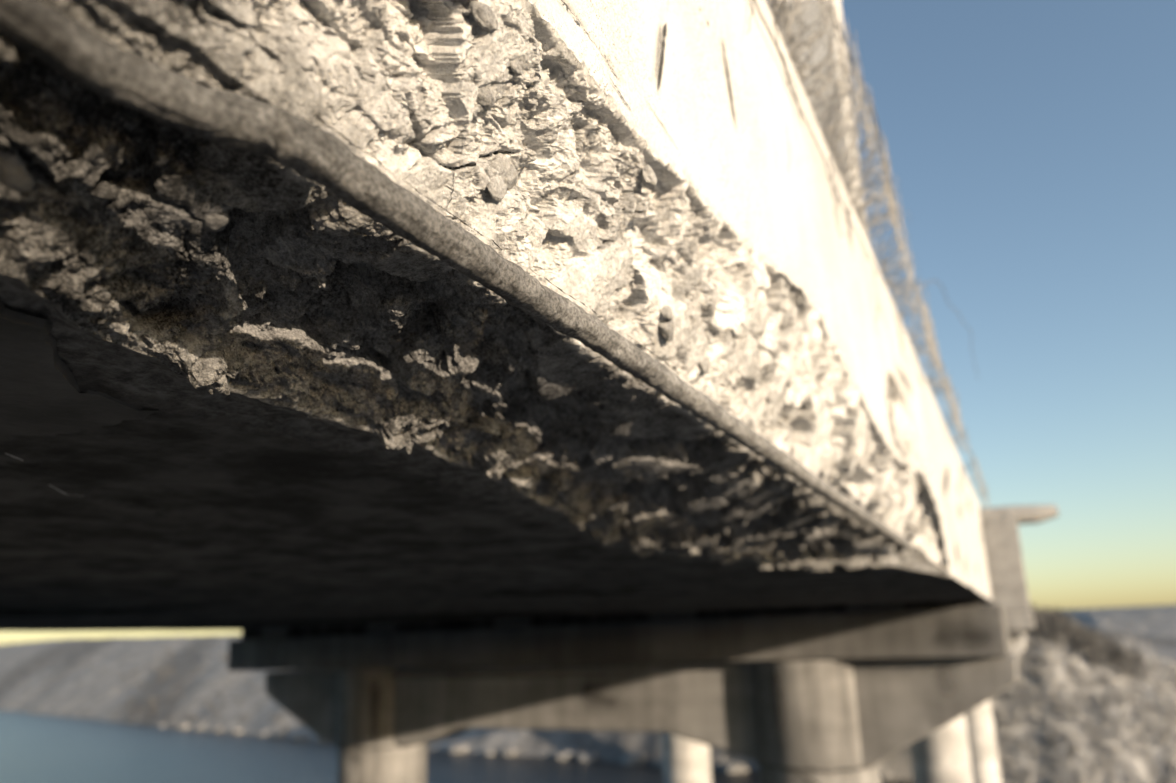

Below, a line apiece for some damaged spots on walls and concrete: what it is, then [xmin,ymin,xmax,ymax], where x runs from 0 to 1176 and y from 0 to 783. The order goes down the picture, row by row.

spalling [0,0,950,577]
crack [561,0,677,147]